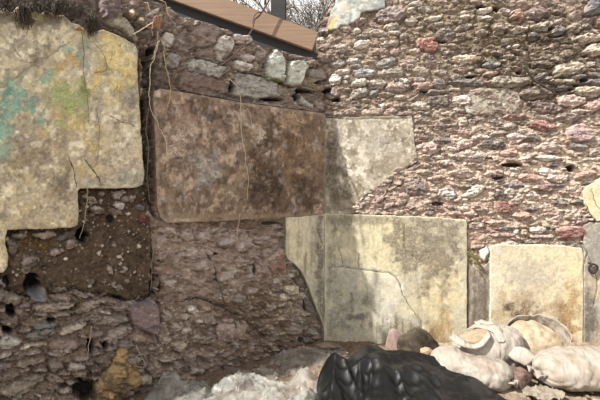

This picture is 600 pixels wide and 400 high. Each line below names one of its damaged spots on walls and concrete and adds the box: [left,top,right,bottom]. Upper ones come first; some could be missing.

crack [175,253,267,339]
water stain [315,243,334,336]
crack [317,230,422,328]